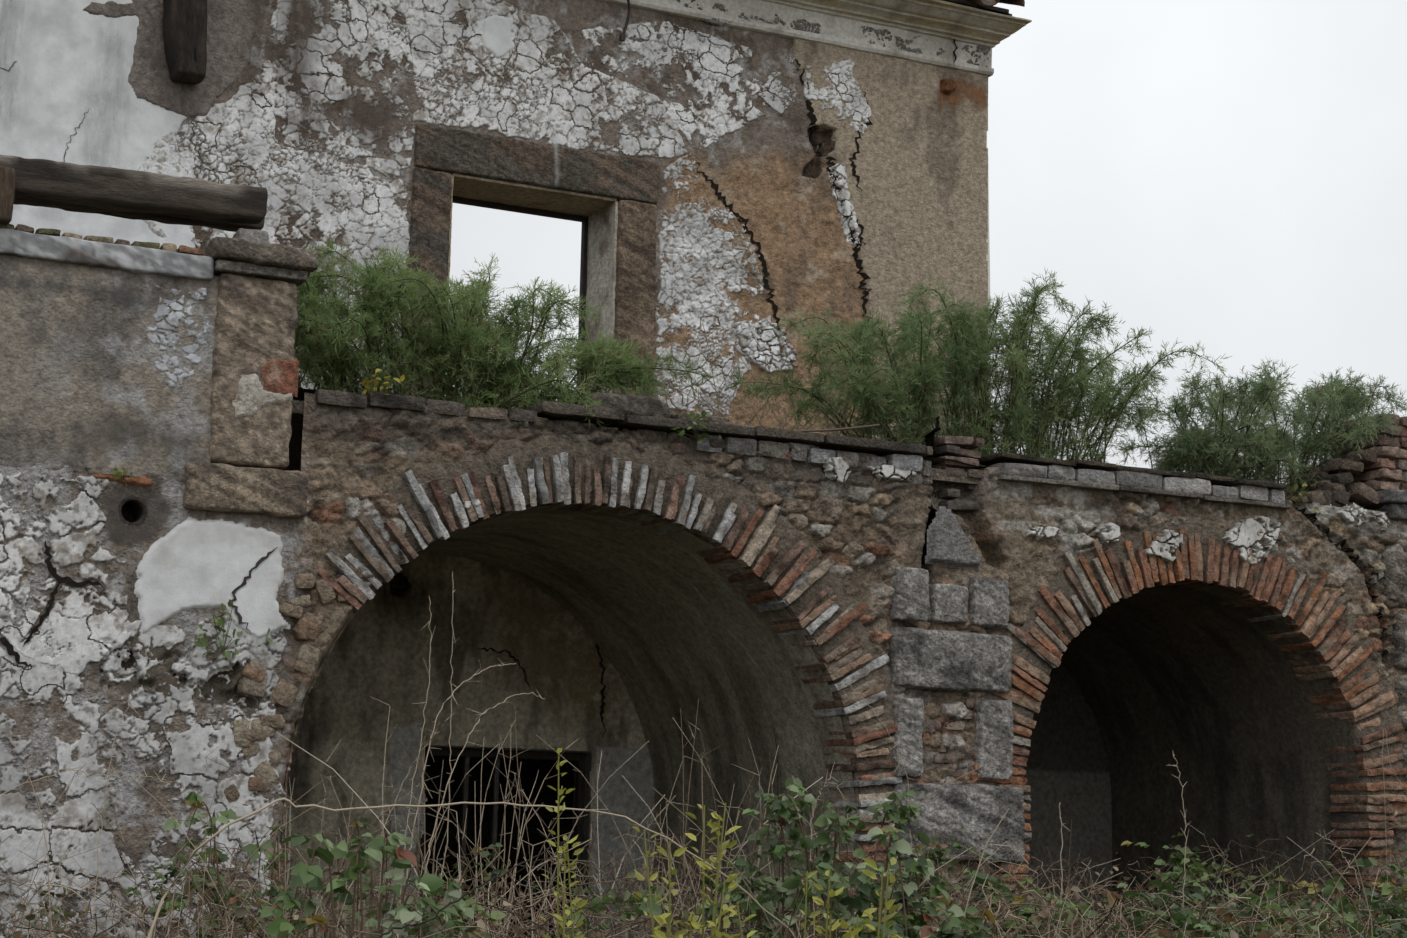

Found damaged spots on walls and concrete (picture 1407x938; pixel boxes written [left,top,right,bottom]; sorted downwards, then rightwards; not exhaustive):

flaking render [861,26,944,56]
corrosion [939,82,986,107]
flaking render [962,45,990,67]
flaking render [83,0,872,416]
crack [693,160,787,345]
crack [795,58,873,330]
crack [0,541,103,670]
crack [231,547,278,635]
flaking render [0,470,287,938]